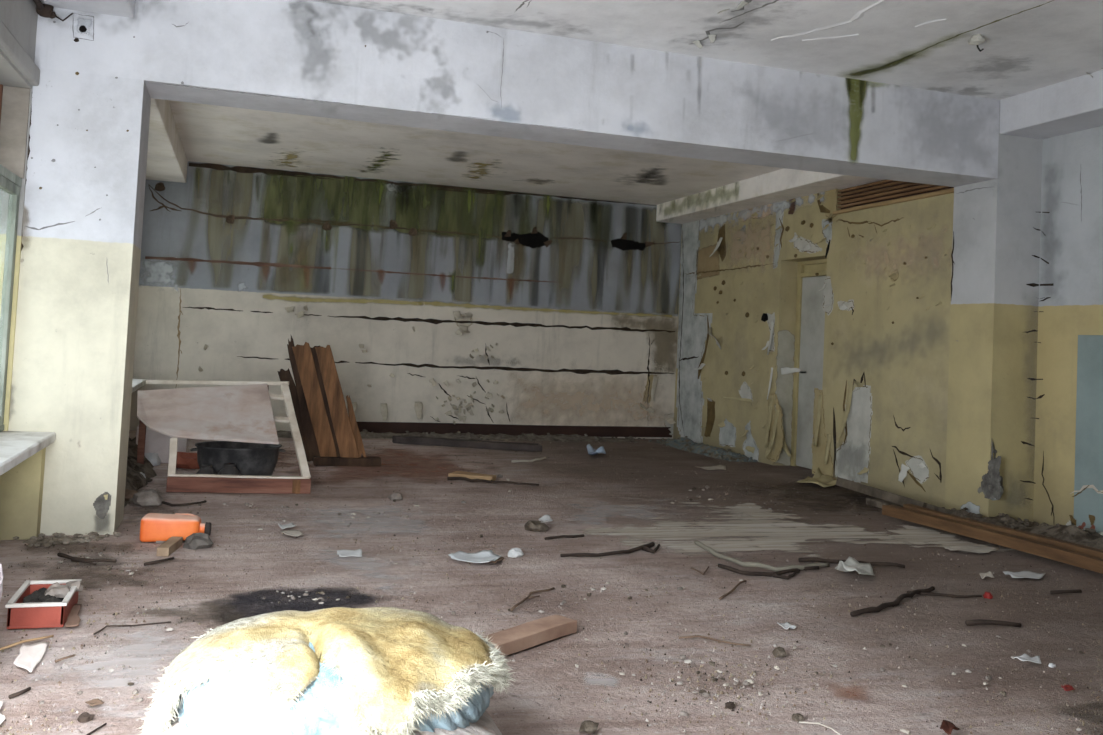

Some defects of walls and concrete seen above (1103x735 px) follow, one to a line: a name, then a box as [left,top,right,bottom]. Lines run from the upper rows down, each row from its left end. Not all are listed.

water stain [145,261,185,284]
water stain [195,168,259,290]
water stain [259,176,680,371]
peeling [756,189,838,269]
crack [1026,172,1082,343]
crack [304,314,675,419]
peeling [640,220,759,462]
peeling [745,312,801,466]
peeling [811,372,873,483]
peeling [892,446,929,492]
spalling [978,441,1004,500]
crack [1020,378,1054,516]